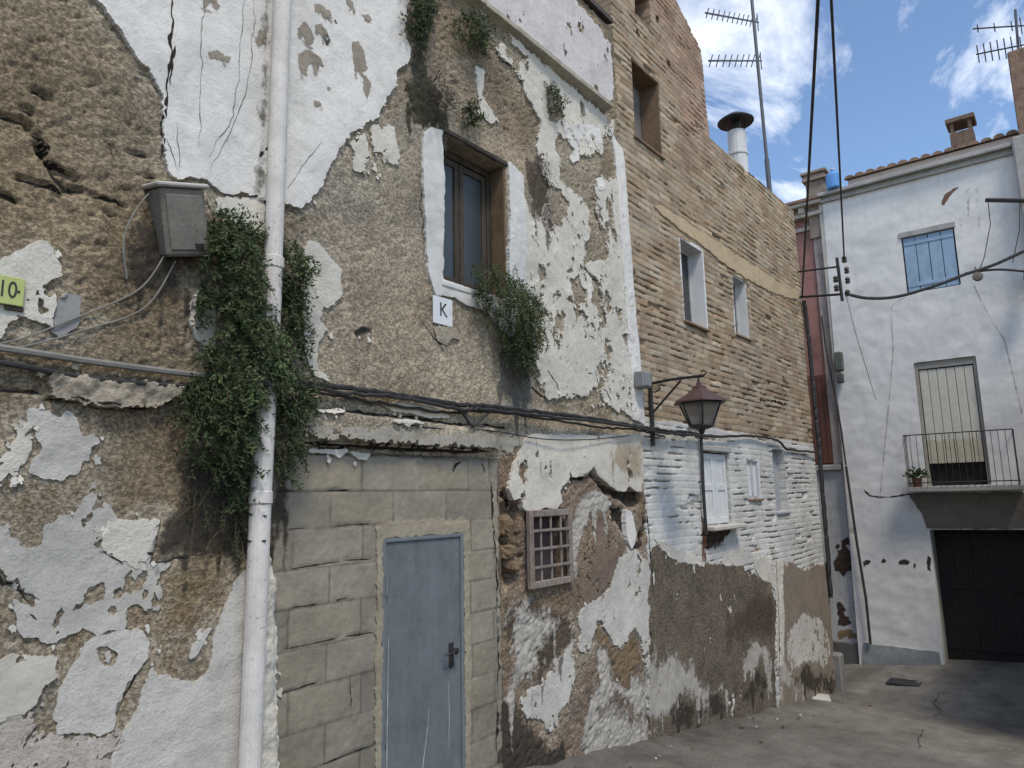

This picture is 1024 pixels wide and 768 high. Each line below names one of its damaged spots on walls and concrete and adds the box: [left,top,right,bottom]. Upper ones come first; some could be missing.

crack [0,91,126,217]
crack [106,0,256,179]
peeling [95,0,274,235]
peeling [285,0,411,209]
peeling [0,240,66,338]
peeling [474,0,851,732]
peeling [0,403,104,487]
peeling [0,482,246,768]
damp [154,458,250,573]
spalling [833,537,886,576]
spalling [899,556,931,571]